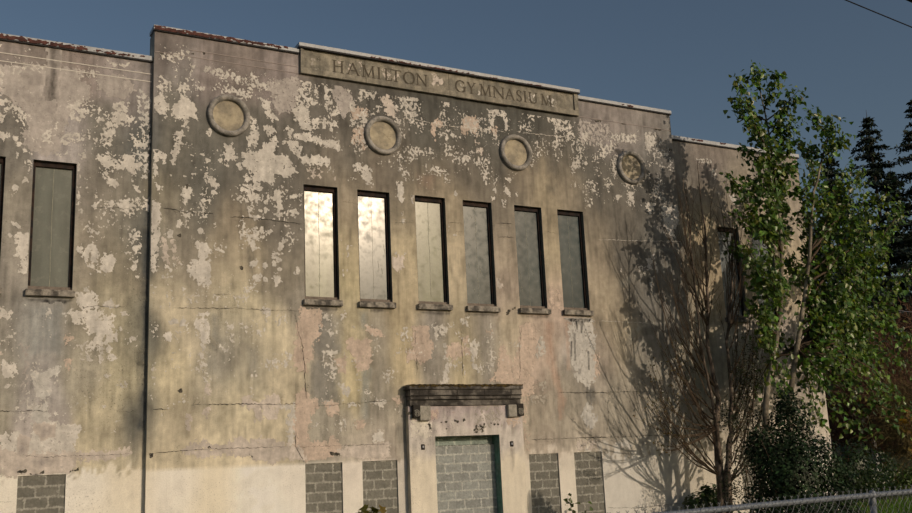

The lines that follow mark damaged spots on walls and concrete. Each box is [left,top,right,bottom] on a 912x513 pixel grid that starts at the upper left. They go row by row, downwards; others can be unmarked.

damp [144,62,153,99]
damp [133,193,188,435]
damp [241,243,258,290]
crack [193,310,384,407]
peeling [0,44,679,479]